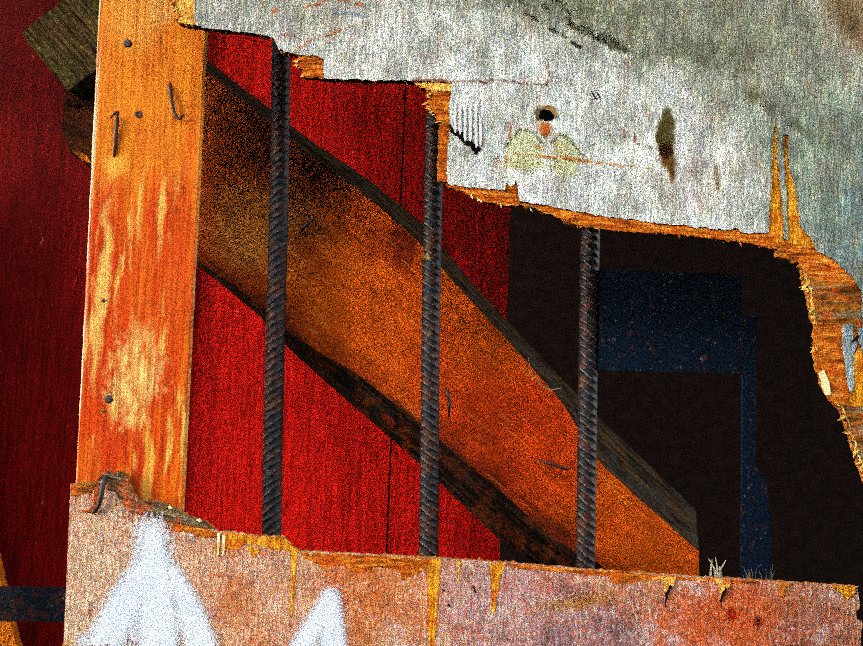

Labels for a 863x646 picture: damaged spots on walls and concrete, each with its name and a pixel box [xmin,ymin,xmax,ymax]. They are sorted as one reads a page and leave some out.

spalling [157,40,521,646]
peeling [489,121,863,615]